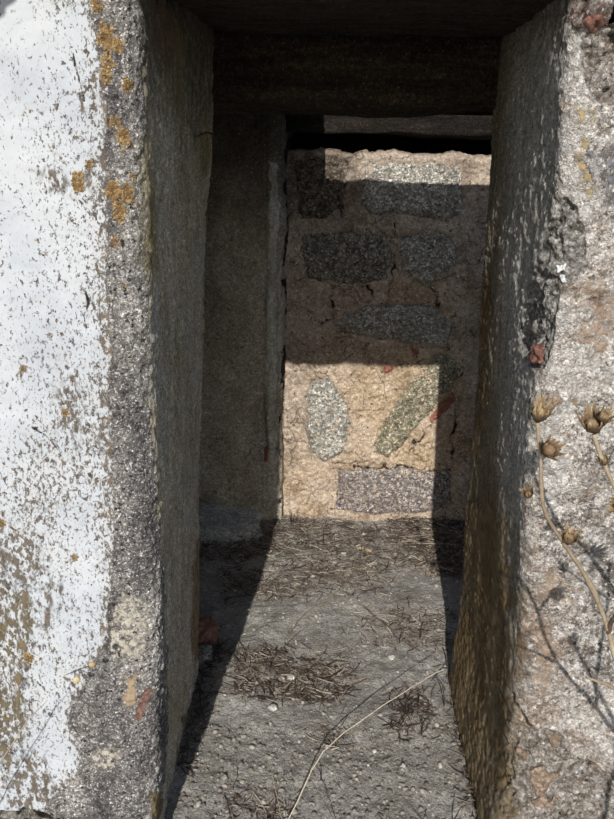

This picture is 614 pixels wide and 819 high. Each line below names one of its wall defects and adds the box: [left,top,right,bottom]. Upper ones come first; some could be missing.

peeling [0,0,169,819]
spalling [566,0,614,103]